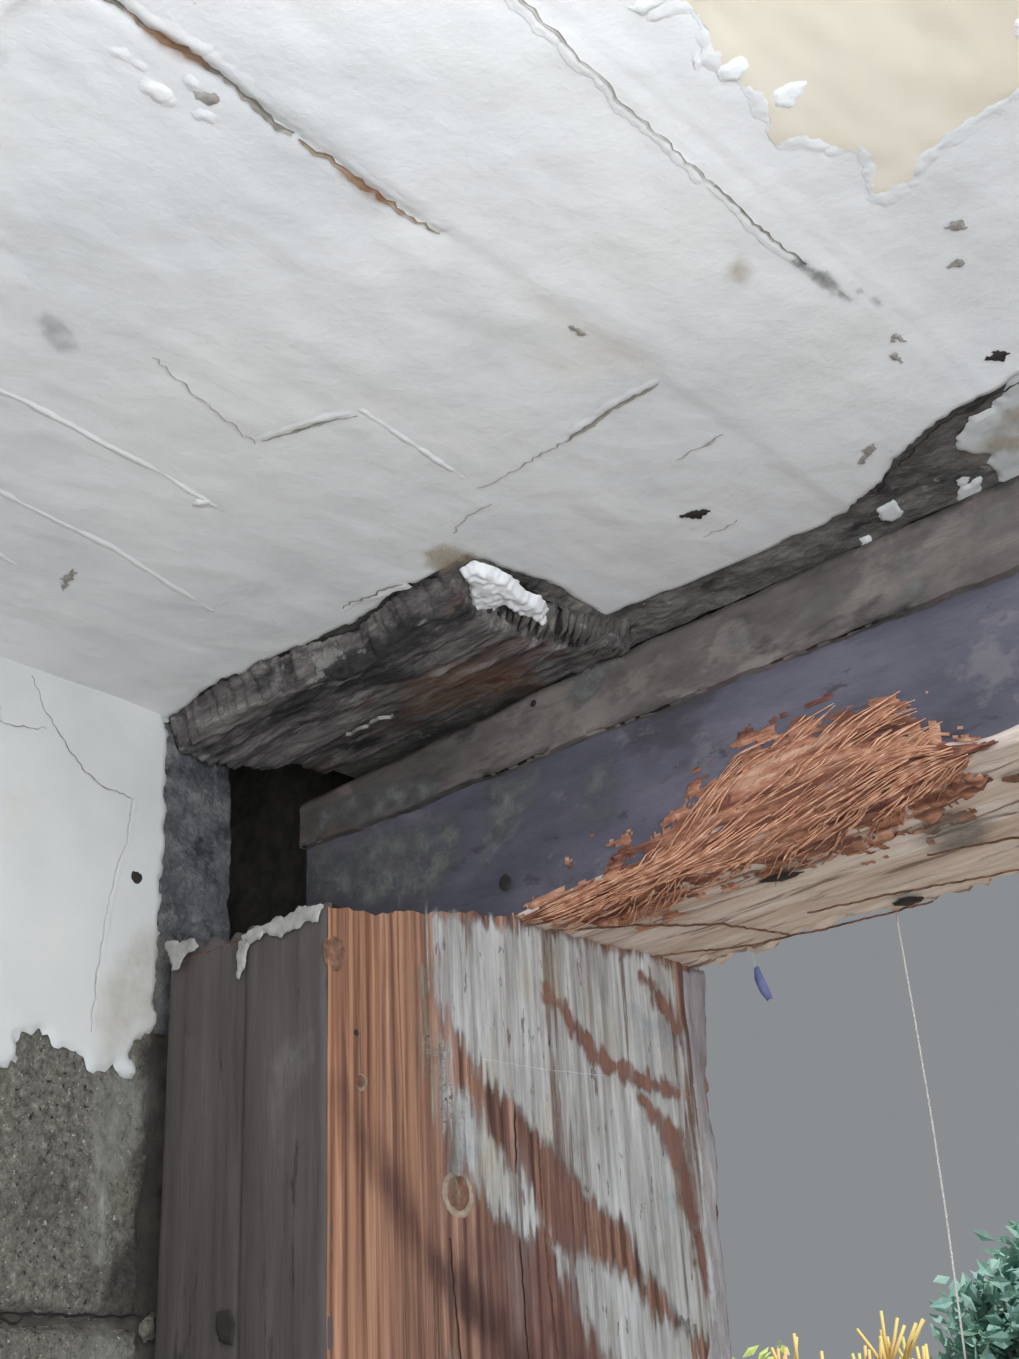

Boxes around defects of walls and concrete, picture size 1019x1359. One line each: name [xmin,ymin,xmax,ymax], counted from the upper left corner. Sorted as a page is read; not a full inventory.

crack [104,0,450,234]
crack [505,0,825,280]
peeling [627,0,1019,207]
crack [152,357,357,444]
peeling [889,333,907,363]
peeling [985,350,1010,362]
spalling [168,374,1019,774]
flaking render [0,1028,156,1359]
crack [0,1311,143,1326]